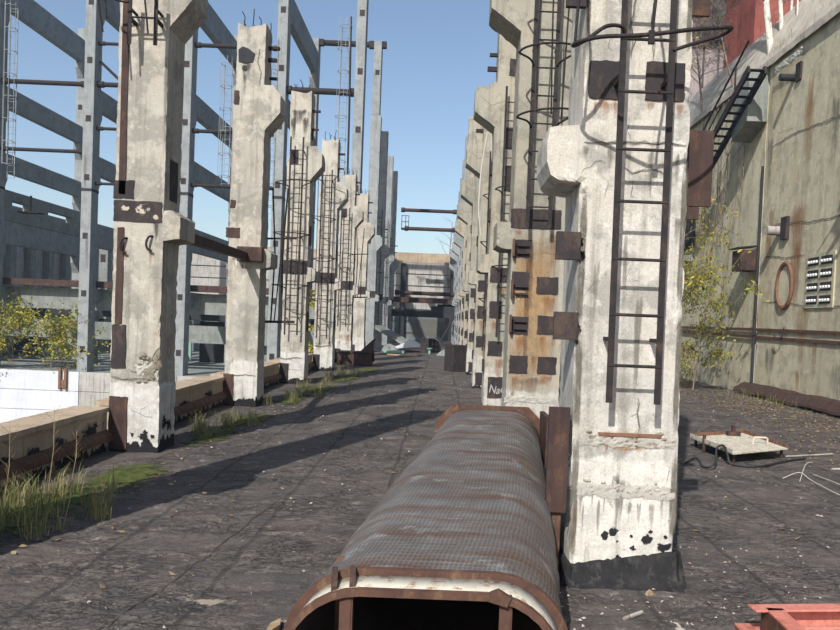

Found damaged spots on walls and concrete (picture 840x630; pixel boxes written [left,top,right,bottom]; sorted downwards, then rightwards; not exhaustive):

crack [582,125,686,211]
peeling [121,204,158,220]
spalling [134,350,162,384]